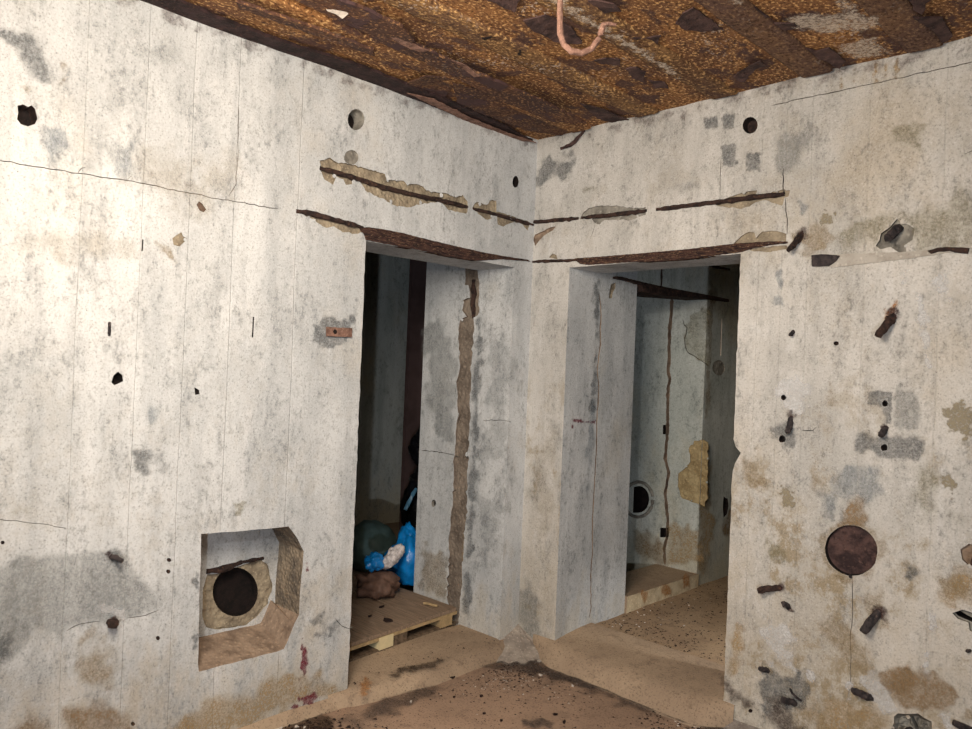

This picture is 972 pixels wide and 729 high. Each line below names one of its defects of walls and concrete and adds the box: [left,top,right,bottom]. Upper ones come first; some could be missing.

corrosion [140,0,536,143]
crack [0,107,277,209]
spalling [320,158,556,246]
spalling [876,219,915,252]
spalling [445,268,480,625]
spalling [678,440,709,507]
spalling [960,538,972,568]
spalling [202,560,272,629]
spalling [892,713,932,729]